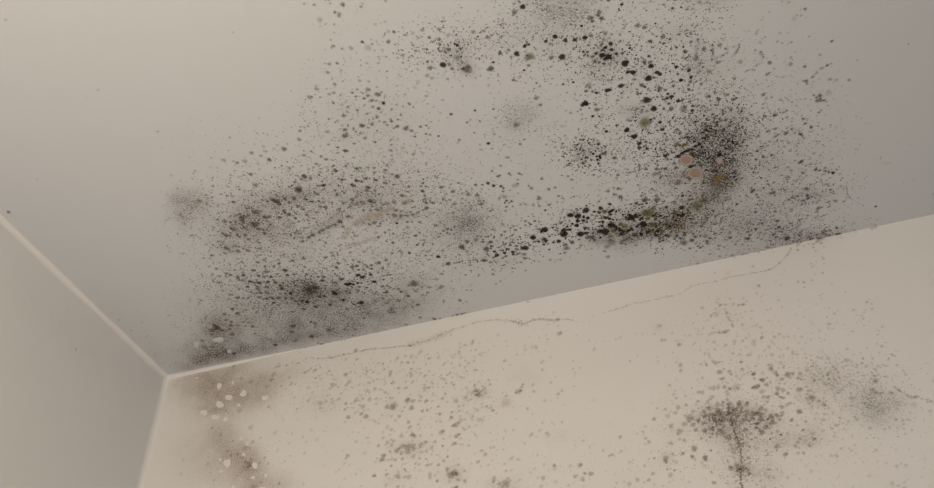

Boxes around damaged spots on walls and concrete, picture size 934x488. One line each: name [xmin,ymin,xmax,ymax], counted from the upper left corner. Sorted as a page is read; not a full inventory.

water stain [156,0,865,365]
water stain [195,376,246,421]